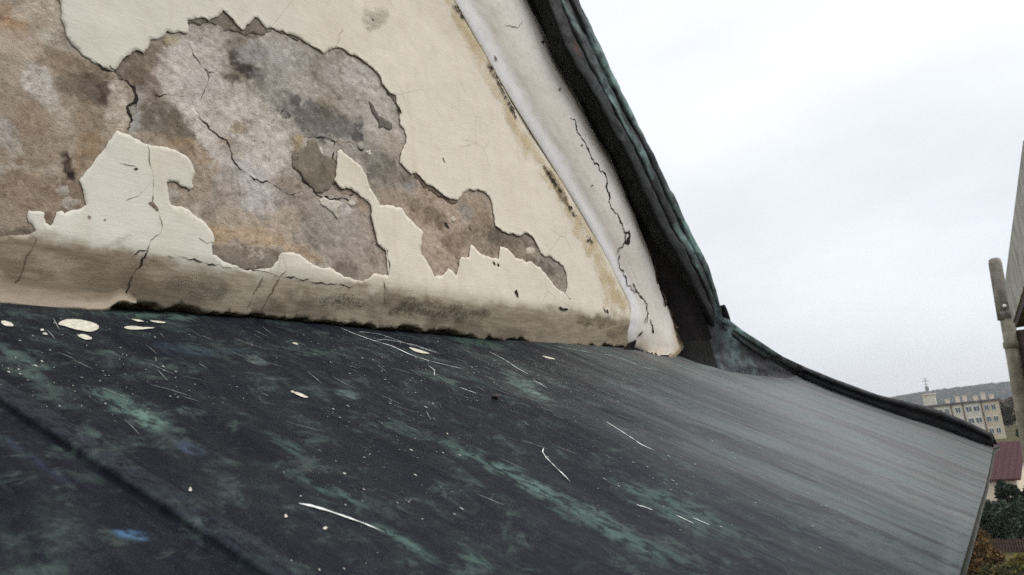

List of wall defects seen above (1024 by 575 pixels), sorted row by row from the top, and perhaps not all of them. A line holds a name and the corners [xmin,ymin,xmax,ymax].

crack [95,48,367,201]
crack [124,147,353,312]
peeling [0,0,567,293]
spalling [544,166,593,244]
crack [572,119,654,333]